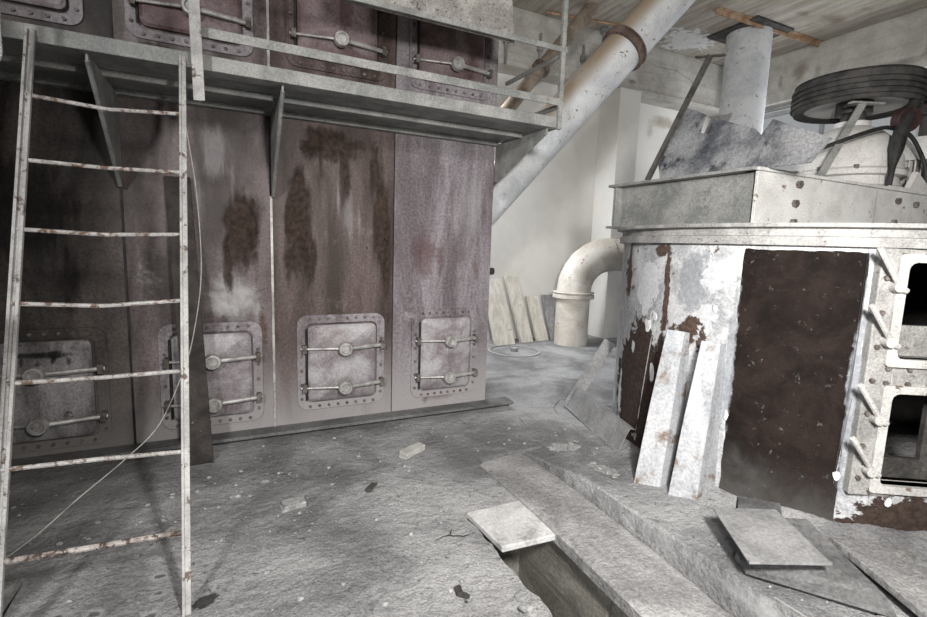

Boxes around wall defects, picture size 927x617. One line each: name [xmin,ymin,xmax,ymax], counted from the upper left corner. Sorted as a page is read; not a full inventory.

leakage [213,278,261,317]
peeling [616,260,661,449]
peeling [678,245,742,430]